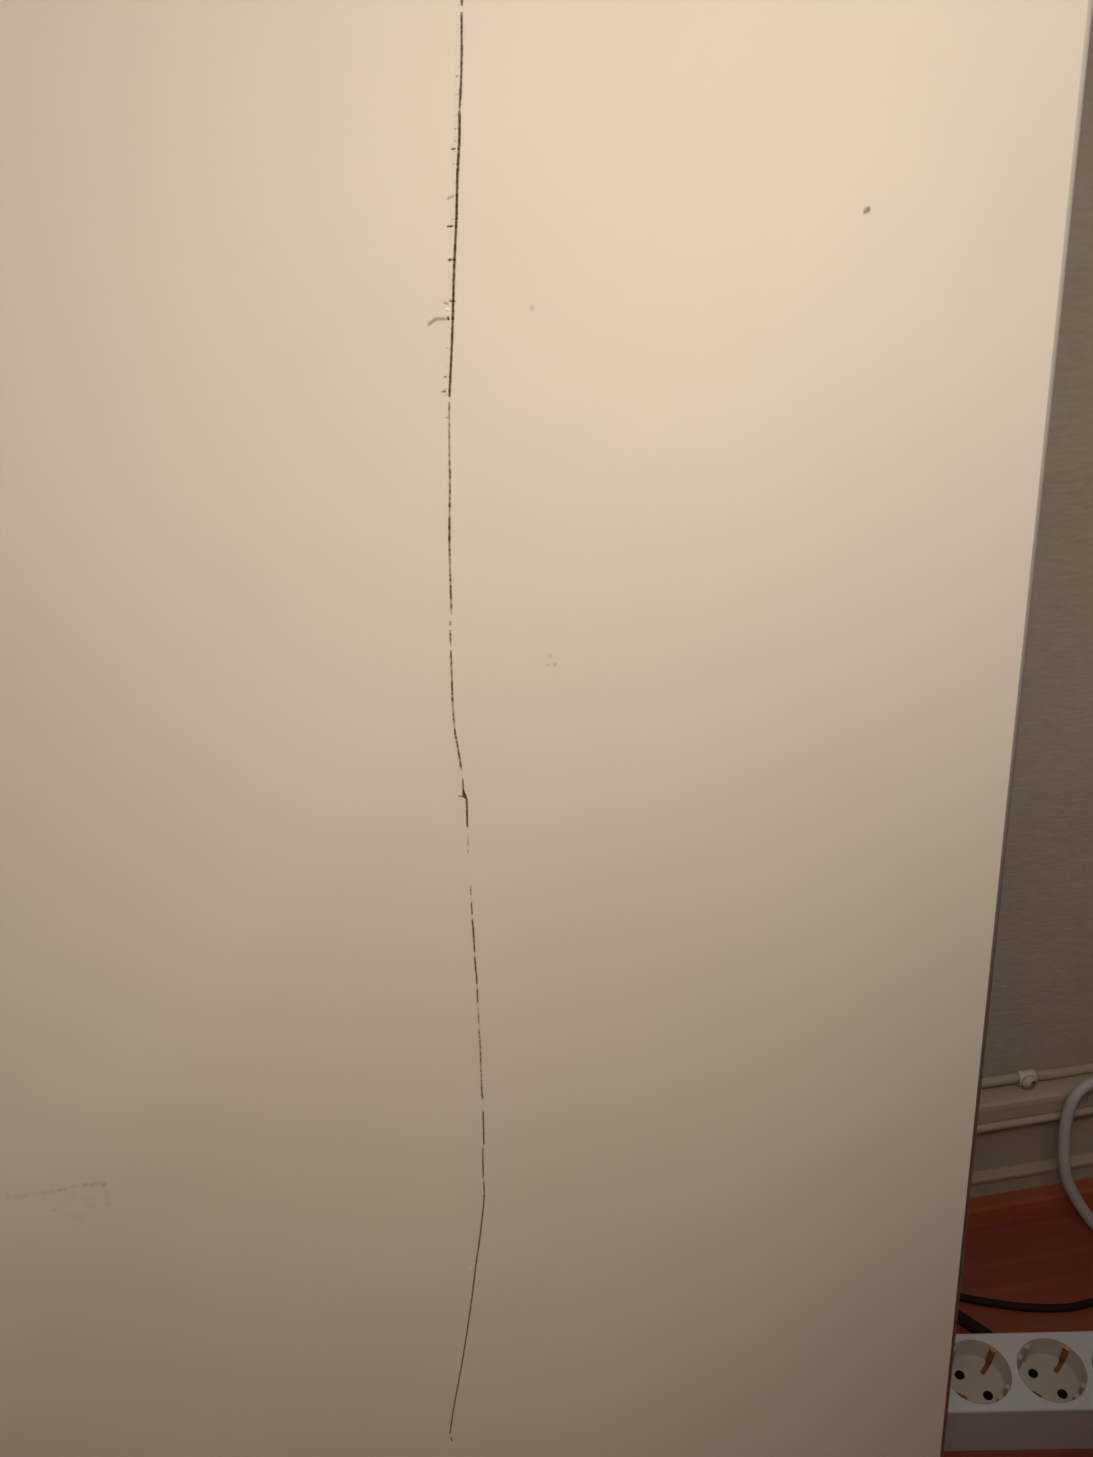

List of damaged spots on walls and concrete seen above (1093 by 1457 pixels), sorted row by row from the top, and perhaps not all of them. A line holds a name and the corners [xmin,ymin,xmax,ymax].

crack [443,0,468,827]
crack [448,903,485,1441]